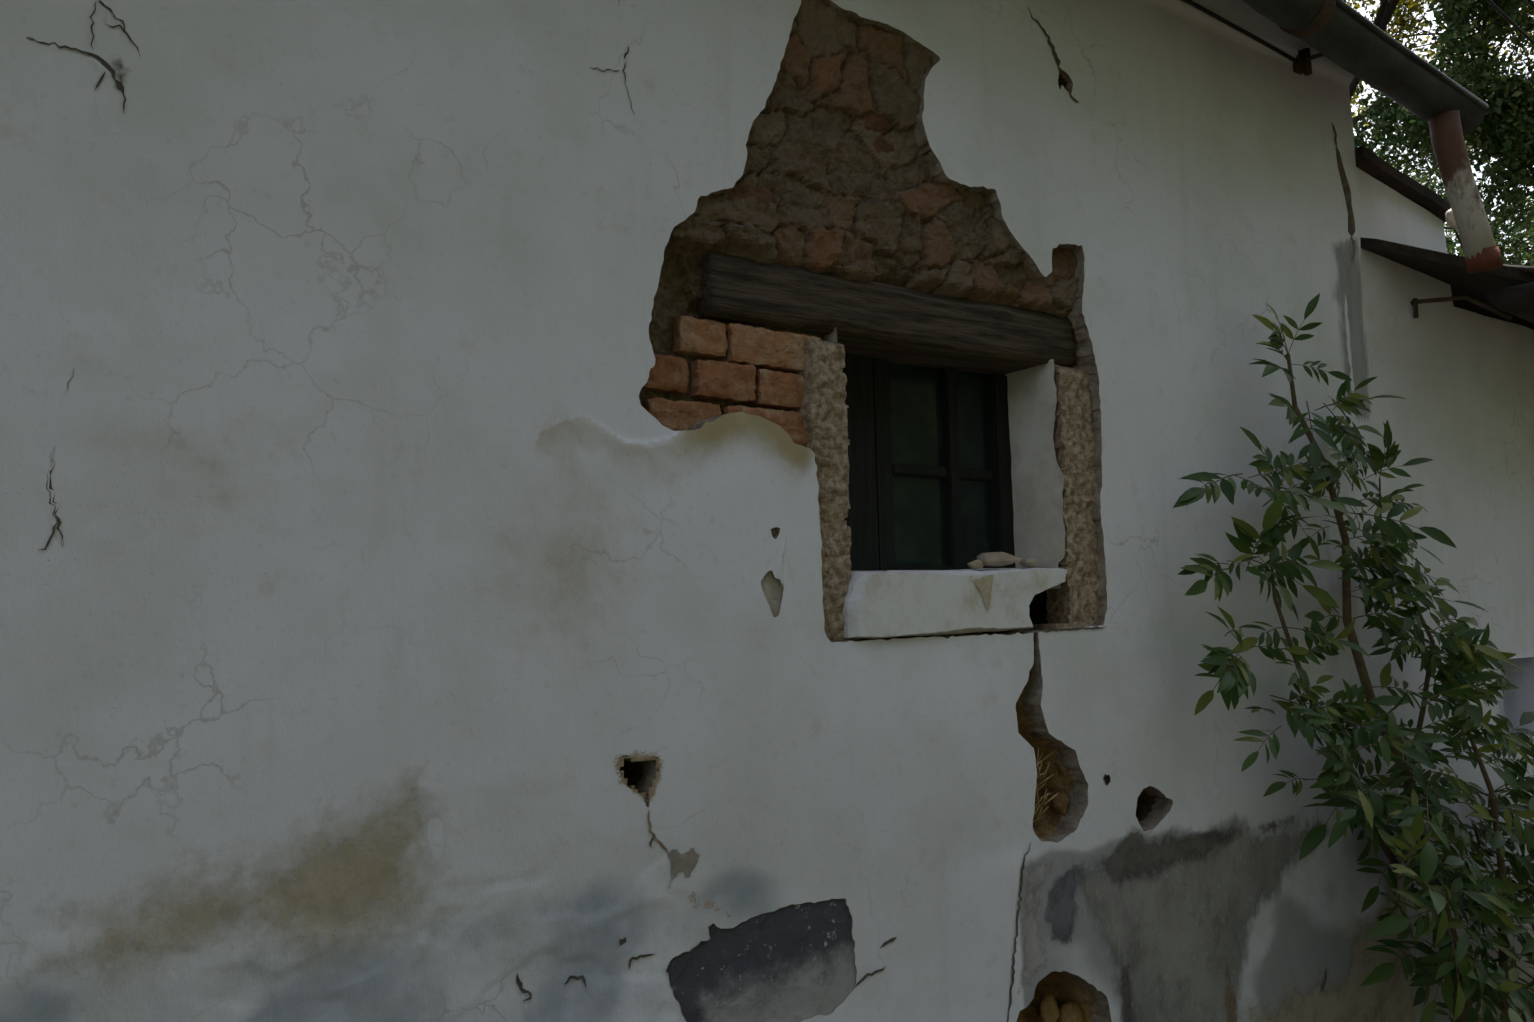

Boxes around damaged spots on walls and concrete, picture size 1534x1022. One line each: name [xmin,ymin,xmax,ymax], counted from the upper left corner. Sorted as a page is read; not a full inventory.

crack [26,0,140,113]
crack [590,47,634,113]
crack [1028,7,1079,103]
spalling [639,0,1079,642]
crack [35,442,64,550]
spalling [982,363,1100,634]
leakage [256,816,417,931]
peeling [616,751,885,1022]
spalling [1103,791,1235,882]
leakage [1081,820,1416,1022]
spalling [1017,971,1096,1022]